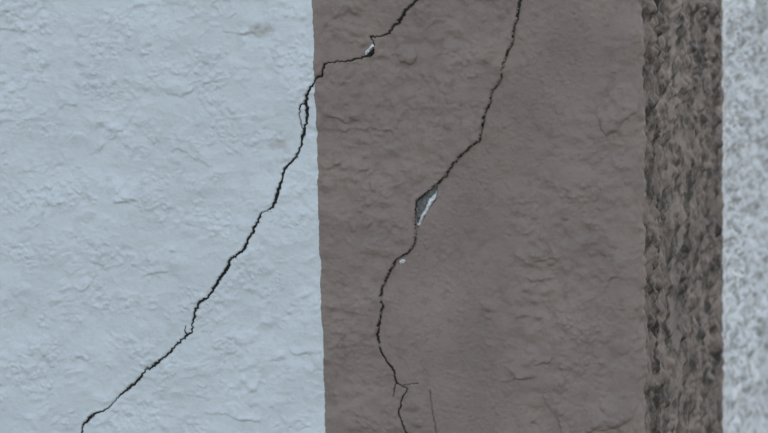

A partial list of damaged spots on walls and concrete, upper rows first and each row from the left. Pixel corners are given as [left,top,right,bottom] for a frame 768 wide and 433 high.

crack [81,0,418,433]
spalling [416,186,438,226]
crack [376,0,522,433]